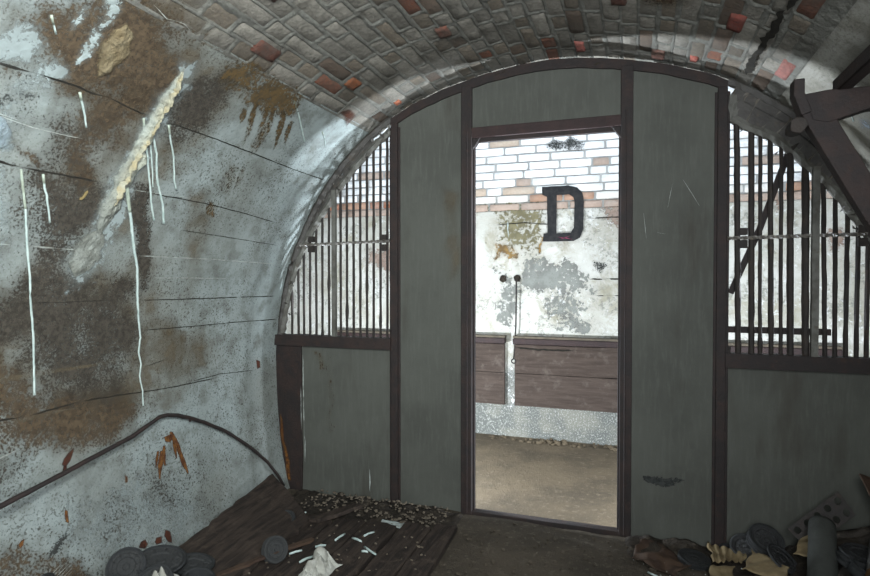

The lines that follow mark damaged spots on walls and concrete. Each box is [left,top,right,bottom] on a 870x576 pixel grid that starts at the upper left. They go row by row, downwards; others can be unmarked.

crack [0,62,323,182]
rust [240,103,294,152]
crack [136,190,272,222]
leakage [0,0,305,507]
crack [0,370,252,422]
rust [62,448,74,471]
rust [155,432,189,479]
leakage [94,435,212,555]